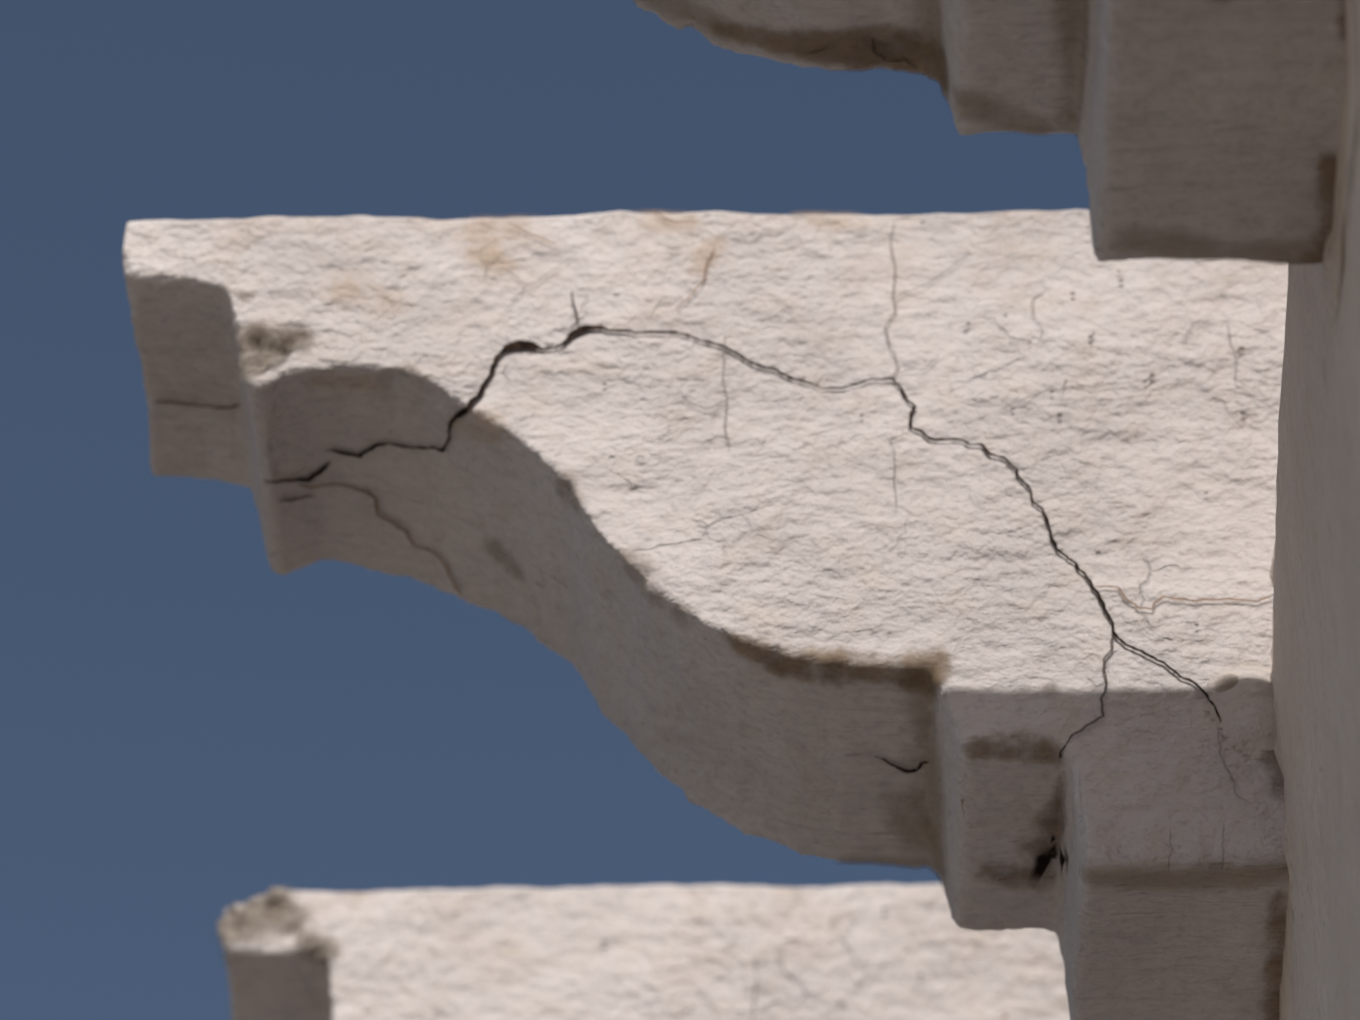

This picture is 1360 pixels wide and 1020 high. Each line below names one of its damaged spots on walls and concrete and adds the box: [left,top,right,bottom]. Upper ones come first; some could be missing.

leakage [1318,158,1344,298]
crack [264,211,1273,758]
leakage [730,637,942,695]
crack [875,756,928,773]
spalling [217,887,339,967]